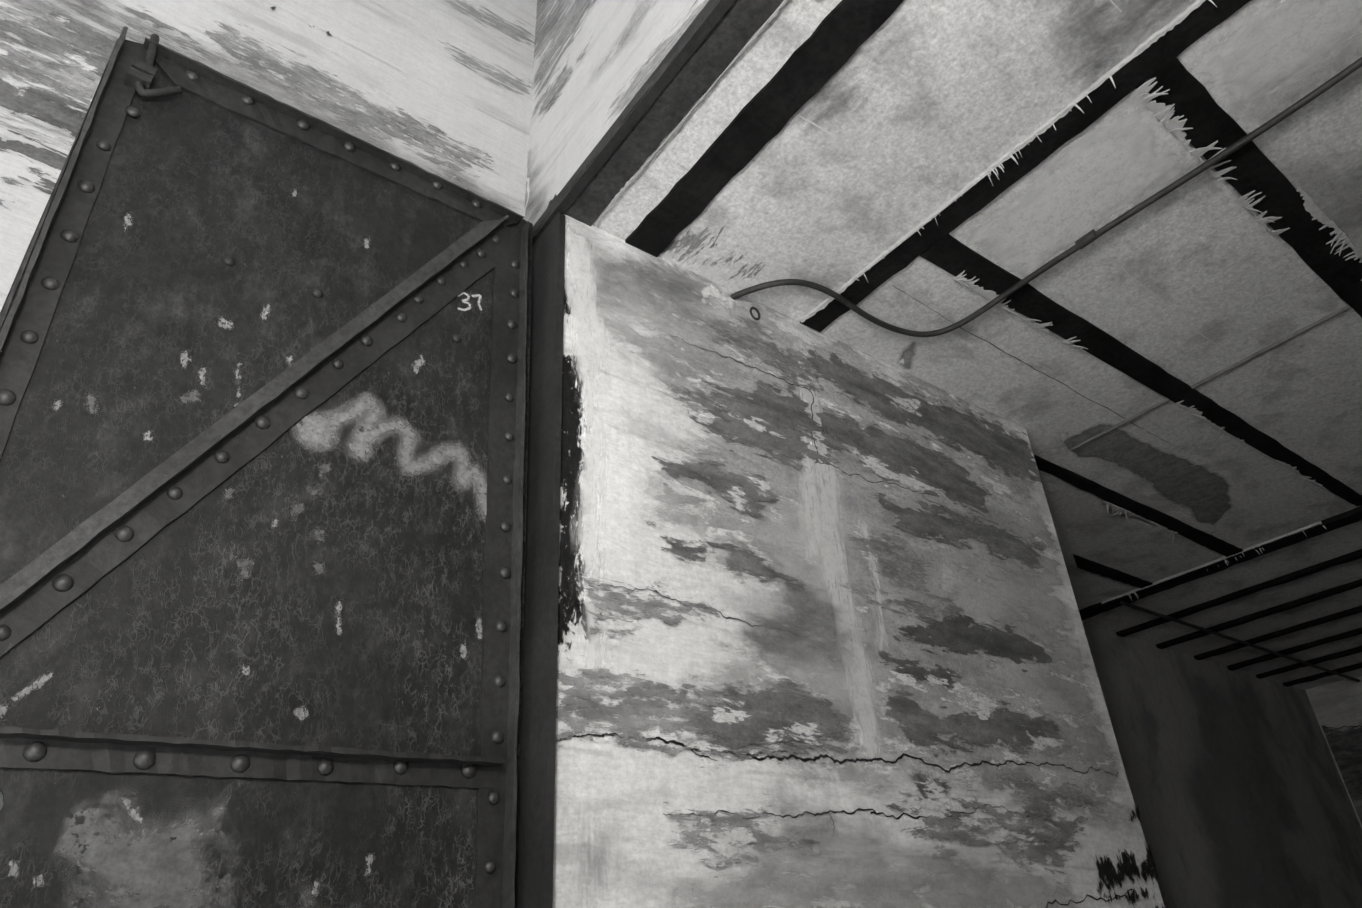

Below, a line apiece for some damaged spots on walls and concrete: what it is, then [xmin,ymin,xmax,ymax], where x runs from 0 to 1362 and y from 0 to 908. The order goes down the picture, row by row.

peeling [0,0,494,195]
peeling [538,41,590,118]
damp [800,0,1217,323]
damp [1064,424,1231,524]
damp [751,339,879,762]
peeling [556,225,1122,884]
damp [861,523,886,648]
damp [1101,521,1326,604]
crack [557,732,1118,776]
crack [663,804,1058,837]
crack [1014,889,1133,908]